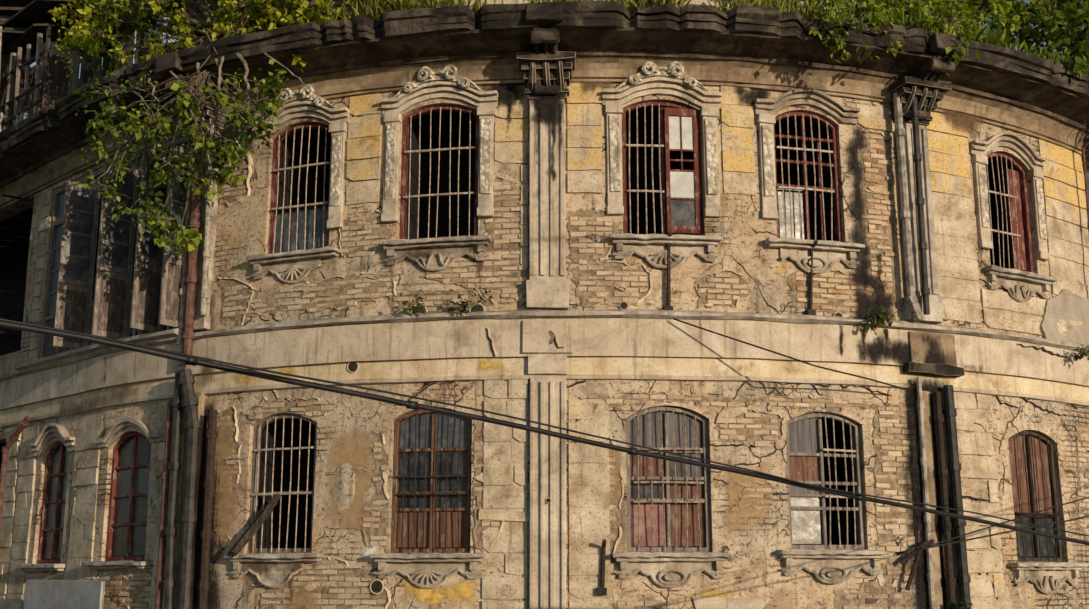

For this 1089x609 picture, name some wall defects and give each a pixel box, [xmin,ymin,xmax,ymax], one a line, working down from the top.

crack [996,396,1077,416]
spalling [576,391,918,609]
spalling [256,551,391,609]
peeling [406,580,476,604]